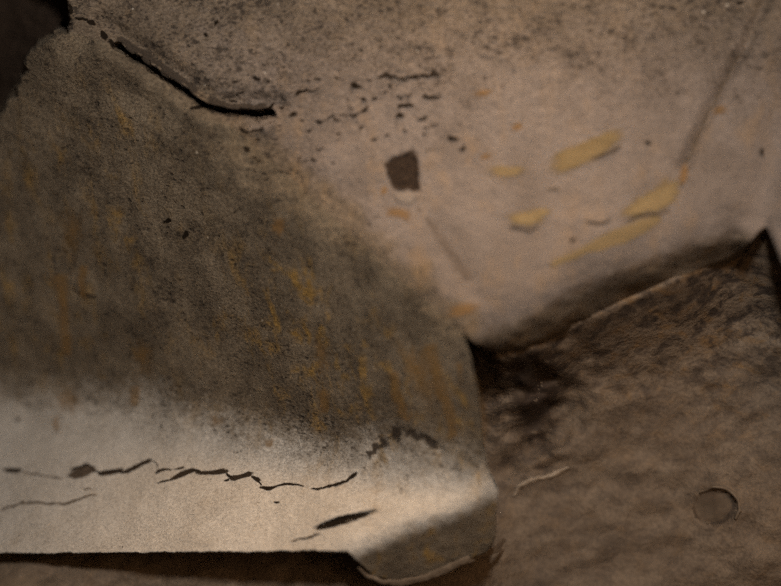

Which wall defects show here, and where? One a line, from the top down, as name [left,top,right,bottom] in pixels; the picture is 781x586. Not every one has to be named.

crack [69,4,442,174]
peeling [552,129,624,171]
spalling [381,148,434,219]
peeling [622,164,688,222]
crack [1,459,357,511]